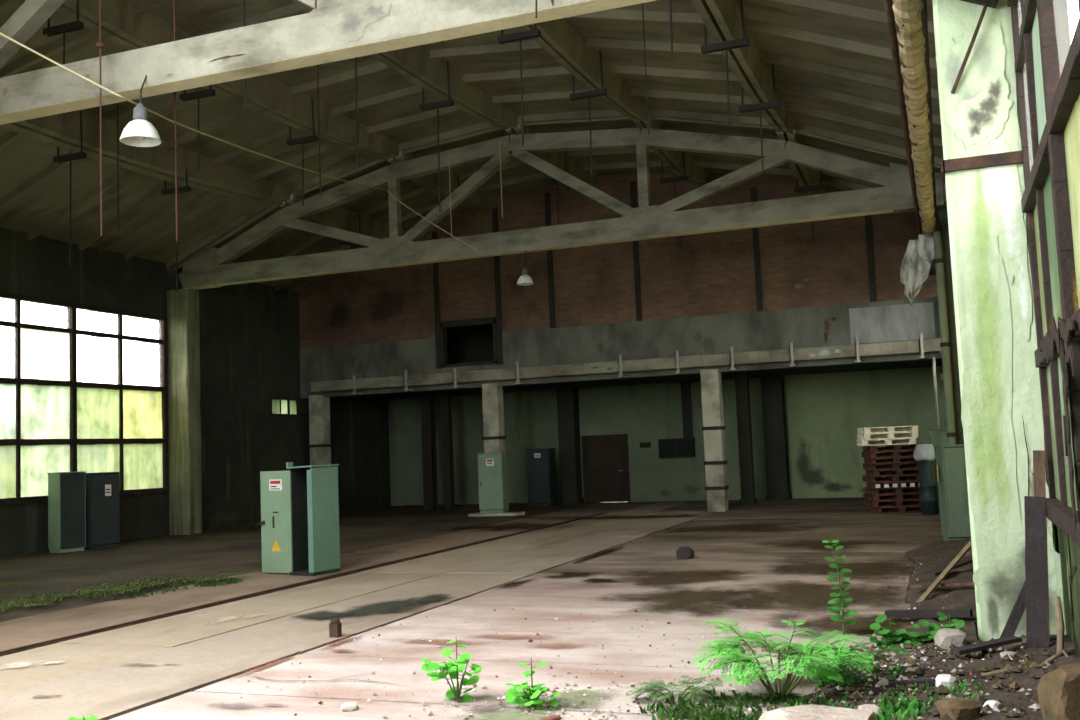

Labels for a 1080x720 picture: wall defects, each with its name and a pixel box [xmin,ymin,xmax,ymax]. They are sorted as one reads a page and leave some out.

leakage [294,594,450,619]